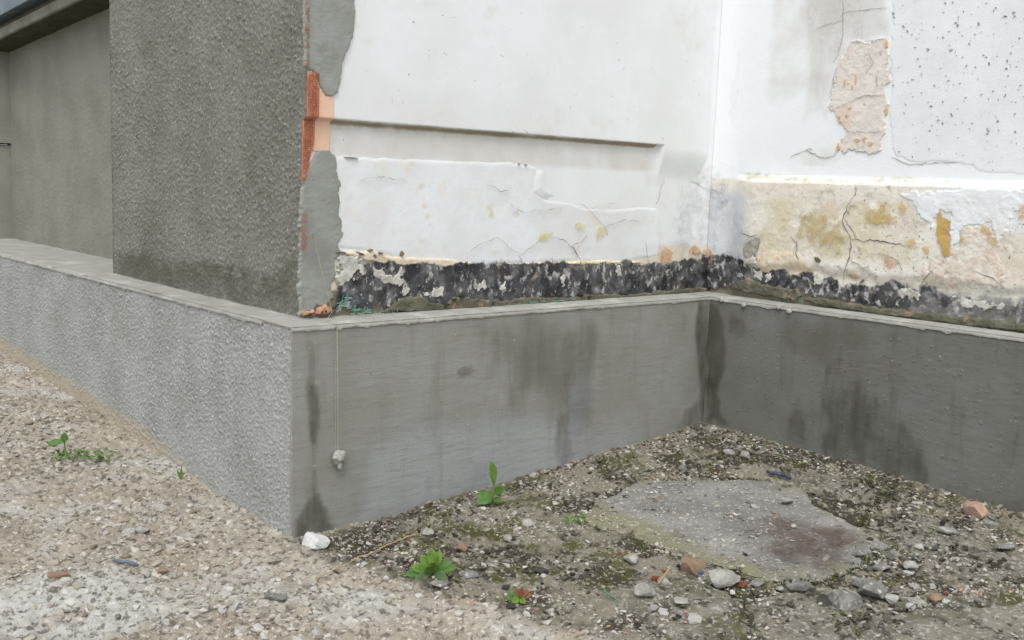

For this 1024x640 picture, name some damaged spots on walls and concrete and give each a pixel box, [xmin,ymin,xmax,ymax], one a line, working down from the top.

spalling [828,37,892,155]
crack [467,183,664,268]
spalling [743,236,772,282]
leakage [798,214,848,246]
crack [842,187,903,280]
leakage [864,202,905,225]
peeling [804,188,1024,332]
leakage [905,209,964,256]
spalling [302,304,333,316]
leakage [697,300,1024,513]